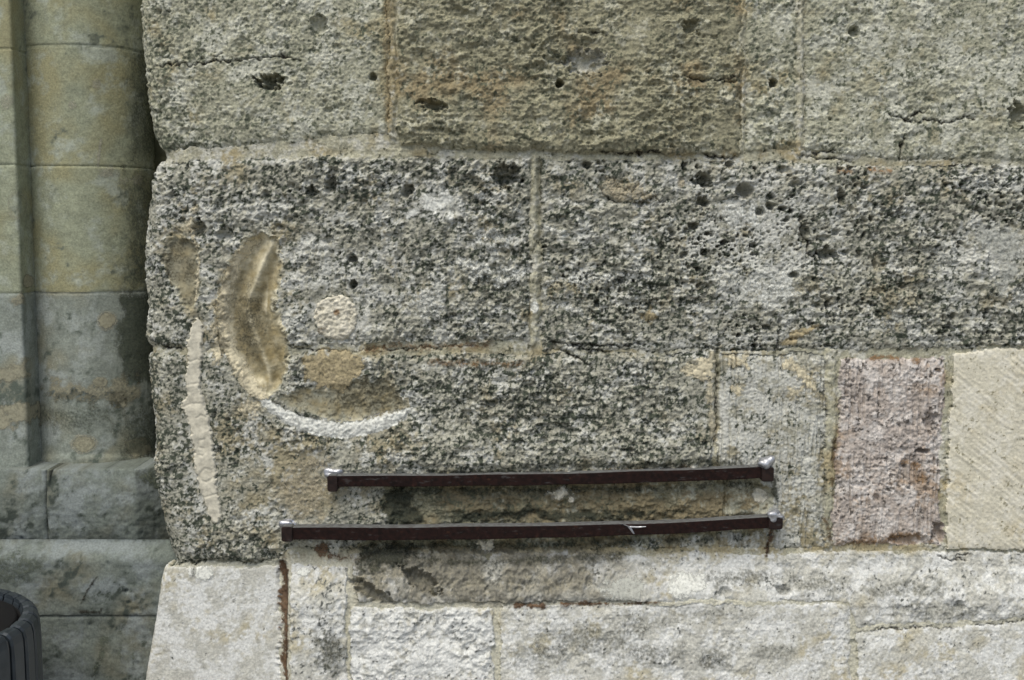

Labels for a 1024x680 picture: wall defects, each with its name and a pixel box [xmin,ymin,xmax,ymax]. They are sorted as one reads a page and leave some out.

crack [148,53,300,72]
crack [889,110,975,161]
rust [277,559,290,680]